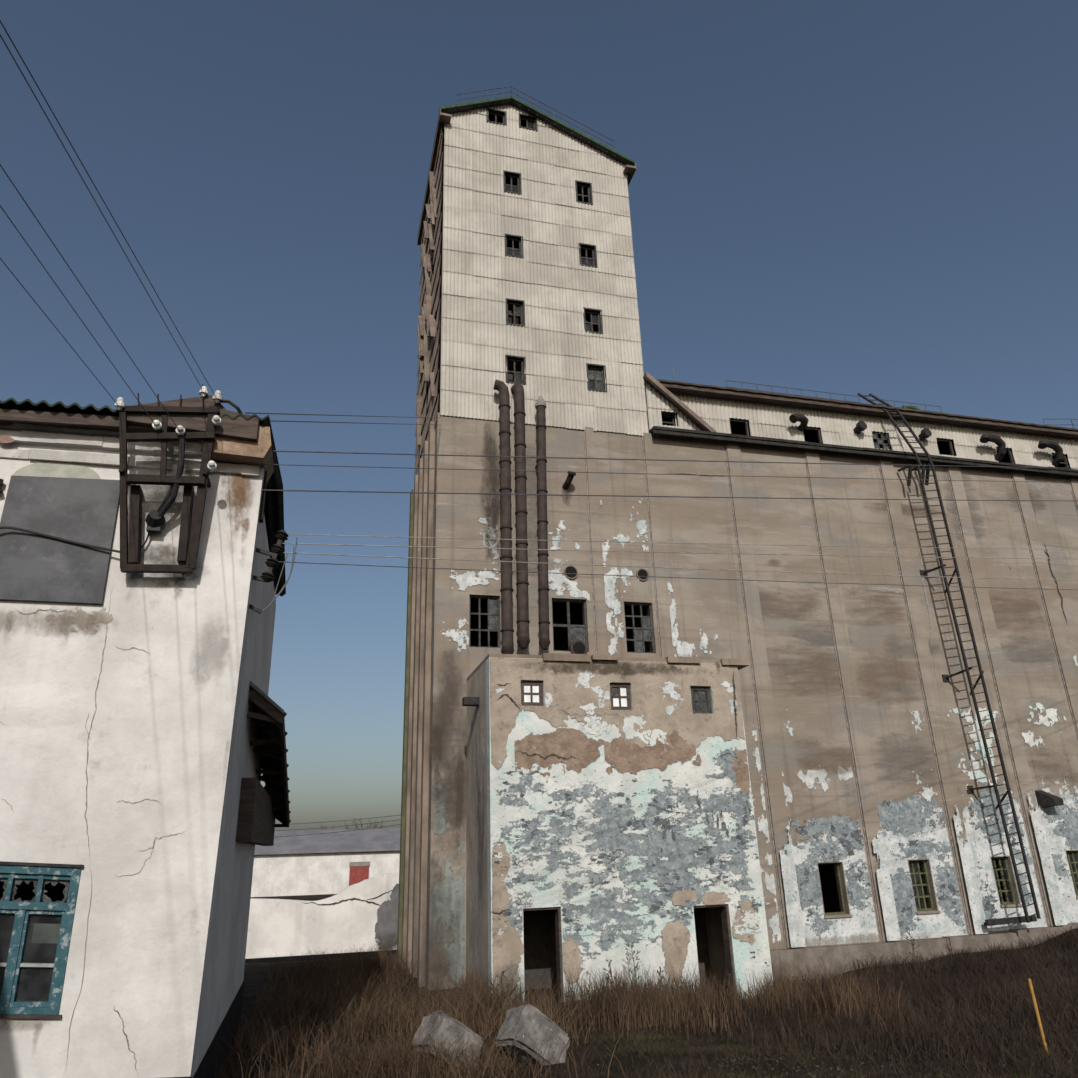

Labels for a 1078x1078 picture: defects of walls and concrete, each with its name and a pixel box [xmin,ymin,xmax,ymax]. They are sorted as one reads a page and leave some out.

peeling [441,517,501,591]
crack [1030,486,1067,622]
peeling [440,618,469,652]
crack [63,591,181,1078]
peeling [432,841,465,988]
peeling [490,499,782,1010]
peeling [782,765,875,940]
peeling [910,710,926,733]
peeling [876,769,967,936]
peeling [977,861,998,927]
peeling [947,705,1035,916]
peeling [1041,789,1078,881]